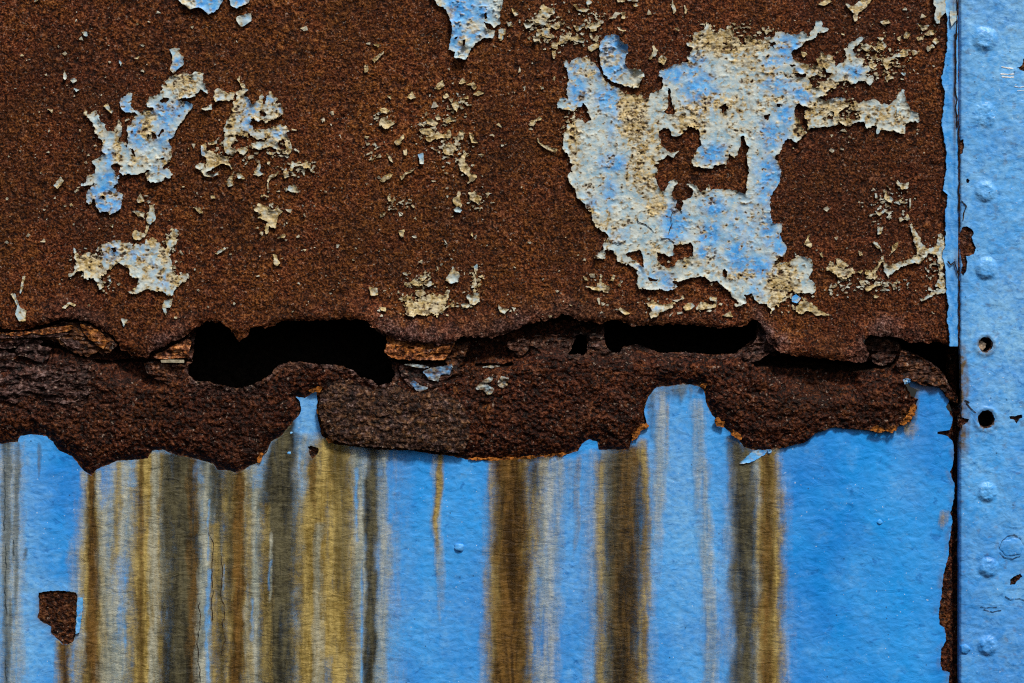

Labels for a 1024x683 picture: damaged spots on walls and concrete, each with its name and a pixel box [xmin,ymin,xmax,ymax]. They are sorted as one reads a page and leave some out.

peeling [379,78,483,213]
peeling [68,48,311,314]
peeling [435,0,976,346]
peeling [11,276,27,322]
peeling [400,264,484,317]
crack [1,343,188,363]
crack [387,357,446,365]
crack [475,361,512,369]
crack [753,355,896,374]
corrosion [0,314,960,683]